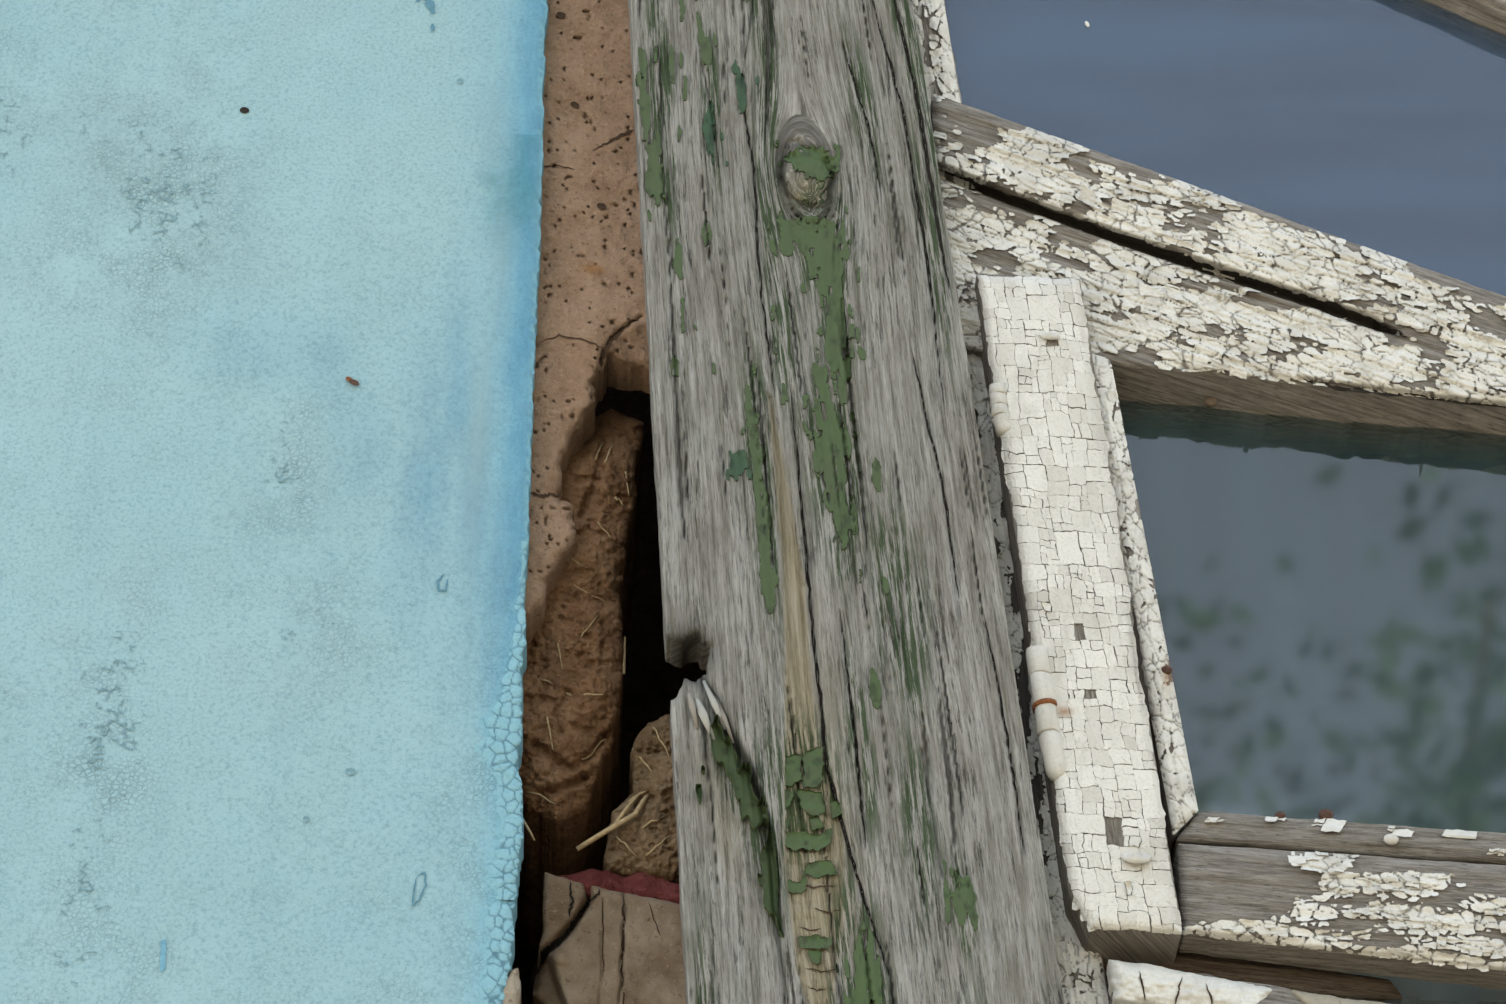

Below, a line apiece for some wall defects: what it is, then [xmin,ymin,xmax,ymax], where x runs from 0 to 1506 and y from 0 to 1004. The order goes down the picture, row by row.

peeling [635,0,717,222]
peeling [1046,172,1162,234]
peeling [1126,259,1183,300]
peeling [1334,253,1463,329]
peeling [767,206,866,550]
peeling [1189,356,1268,379]
crack [842,0,1407,850]
rust [1032,698,1065,714]
peeling [1311,818,1346,832]
peeling [1387,826,1414,837]
peeling [1441,829,1506,855]
peeling [1287,851,1506,972]